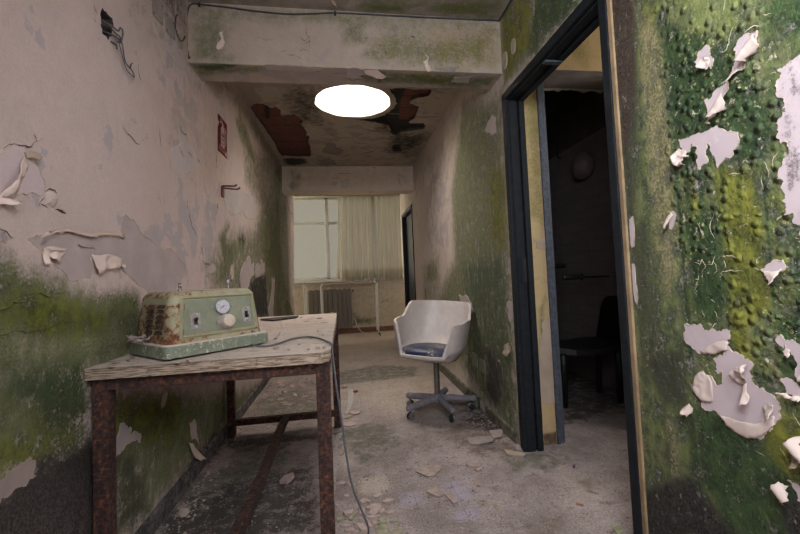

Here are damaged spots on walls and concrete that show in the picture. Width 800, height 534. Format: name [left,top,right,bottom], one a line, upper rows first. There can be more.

peeling [669,30,759,170]
leakage [612,0,684,289]
peeling [775,55,800,235]
peeling [761,259,786,285]
peeling [680,323,800,440]
leakage [117,423,220,534]
leakage [155,495,246,534]
leakage [217,430,318,453]
leakage [645,469,734,534]
leakage [766,479,800,534]
peeling [770,479,800,506]
peeling [783,436,800,469]